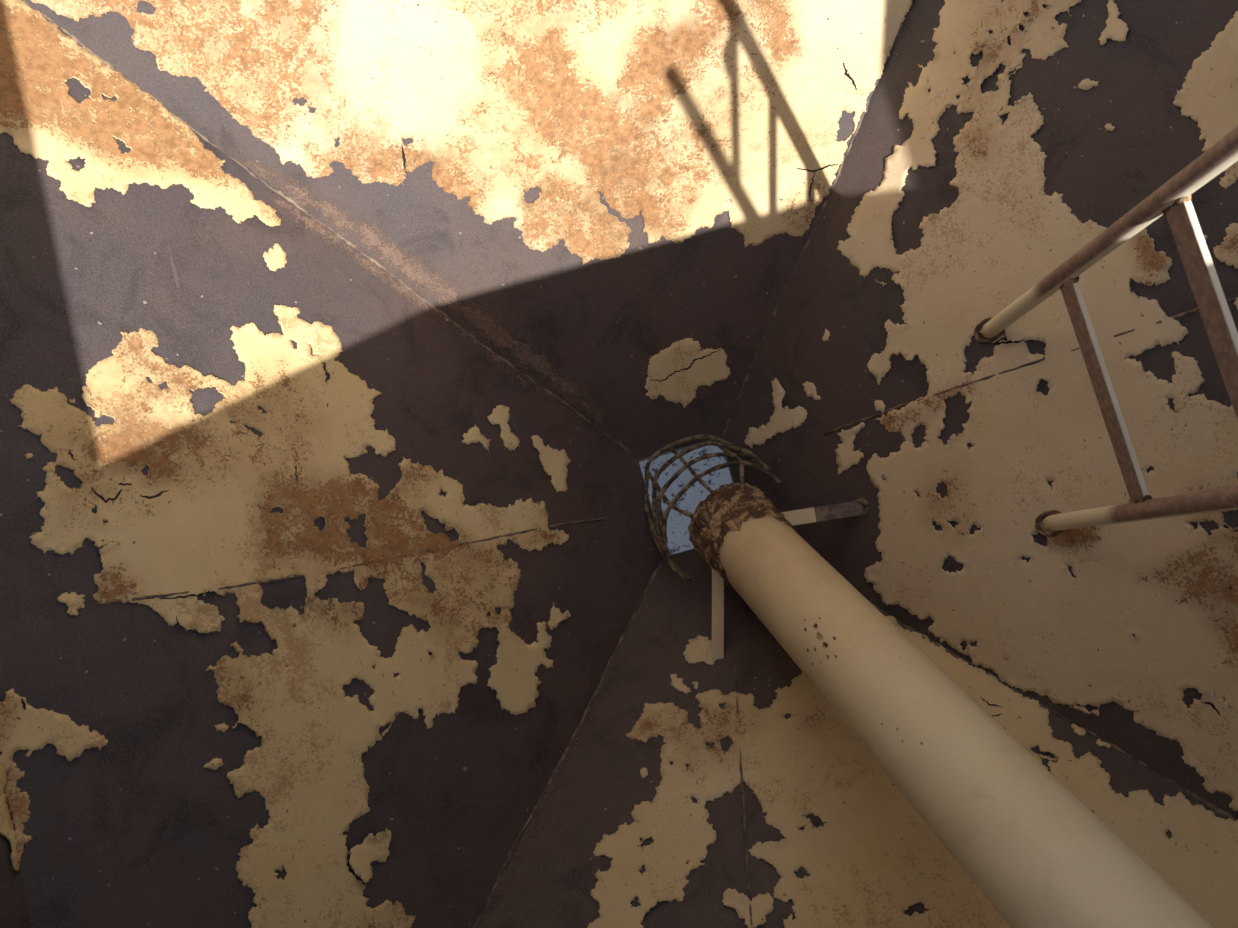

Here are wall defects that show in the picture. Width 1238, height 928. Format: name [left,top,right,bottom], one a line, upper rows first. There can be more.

peeling [263,243,287,271]
peeling [0,304,571,928]
rust [51,330,560,653]
rust [0,0,806,438]
peeling [0,0,912,264]
peeling [644,338,731,408]
crack [650,346,726,381]
peeling [744,378,821,448]
rust [780,179,821,227]
peeling [835,0,1238,928]
rust [1138,513,1238,667]
peeling [587,617,1011,928]